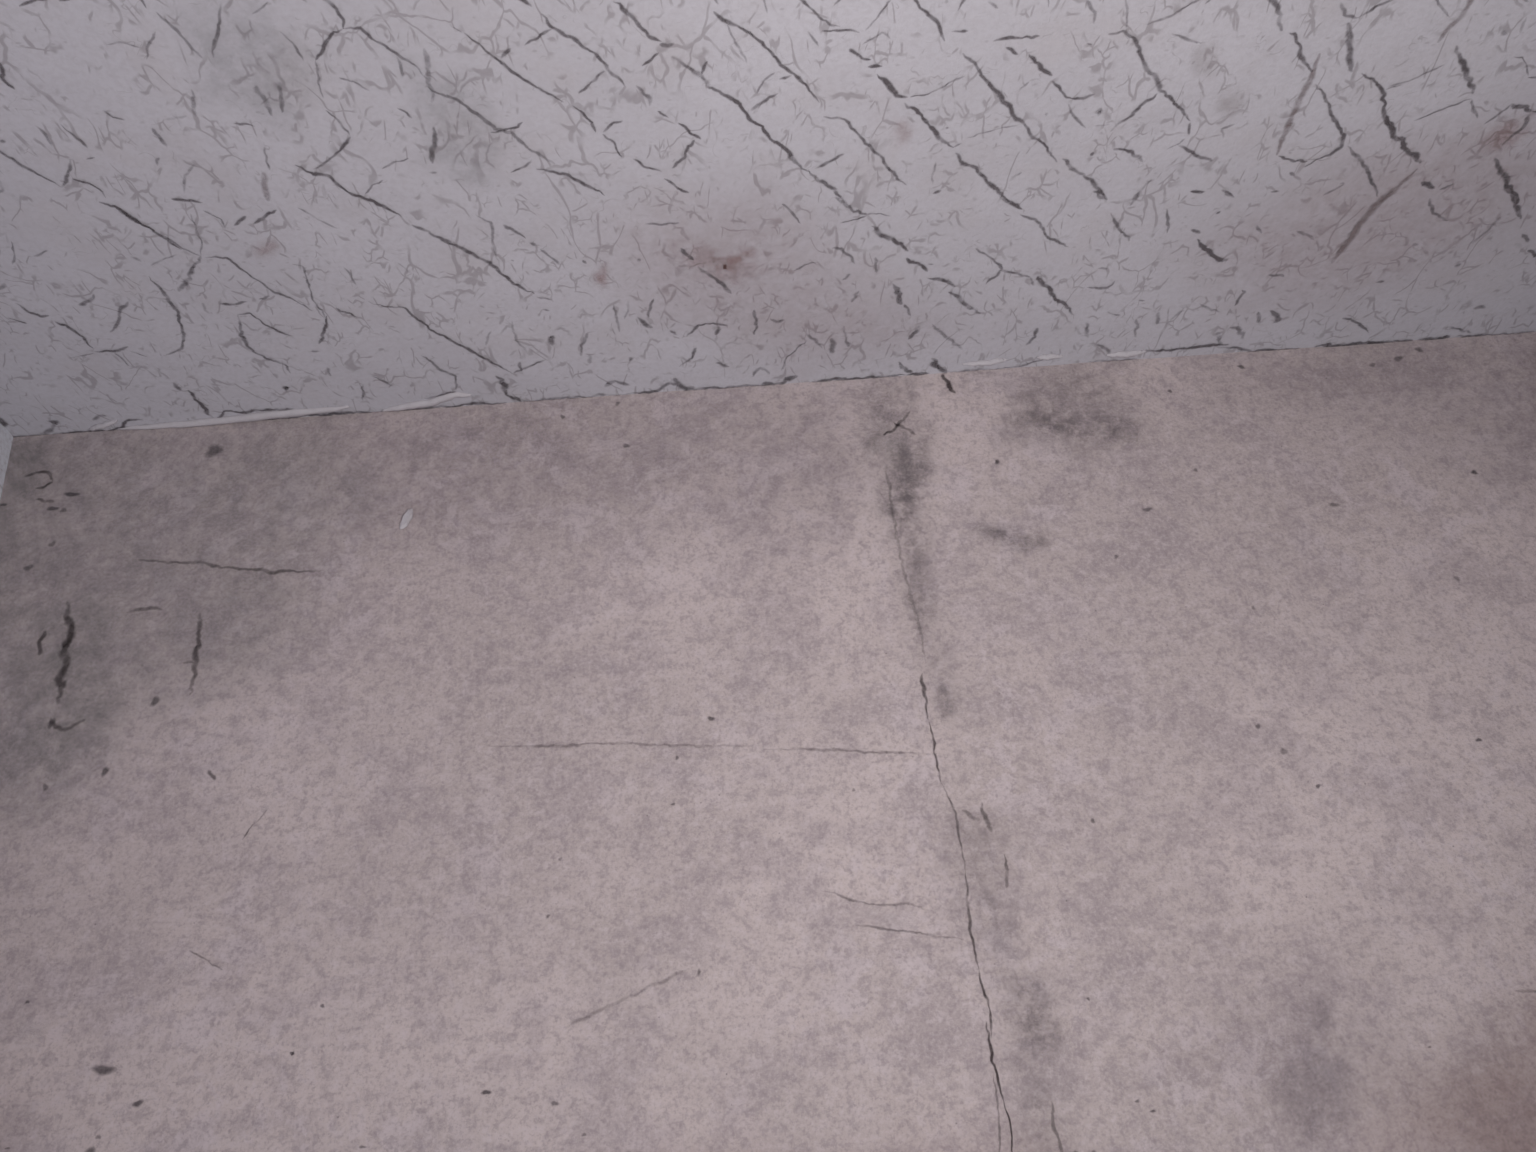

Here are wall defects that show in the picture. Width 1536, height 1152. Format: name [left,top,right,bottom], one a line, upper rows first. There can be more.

crack [0,112,554,420]
crack [296,5,398,59]
crack [455,0,1097,394]
crack [803,0,1231,262]
crack [1270,0,1375,187]
crack [1155,300,1508,352]
crack [1347,5,1437,215]
crack [1459,57,1475,87]
crack [1496,105,1536,257]
crack [0,419,135,438]
crack [920,678,939,771]
crack [967,889,1013,1152]